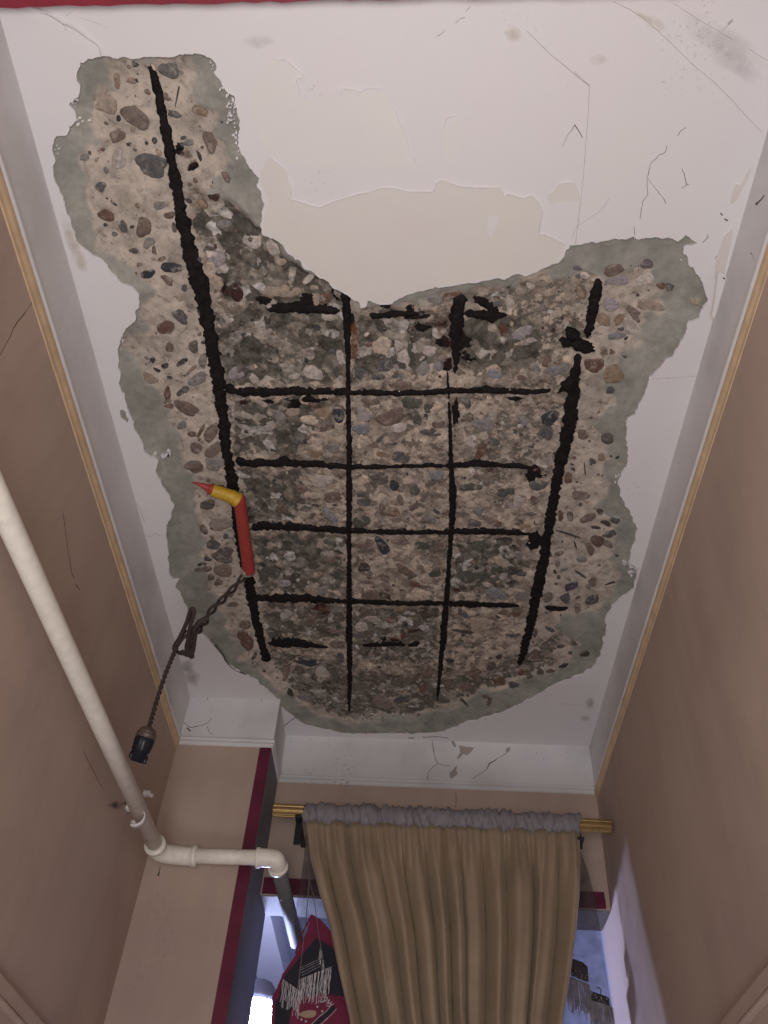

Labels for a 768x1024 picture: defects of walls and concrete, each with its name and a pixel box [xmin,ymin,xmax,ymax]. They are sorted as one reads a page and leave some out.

crack [562,72,609,244]
crack [634,127,689,234]
spalling [53,53,733,778]